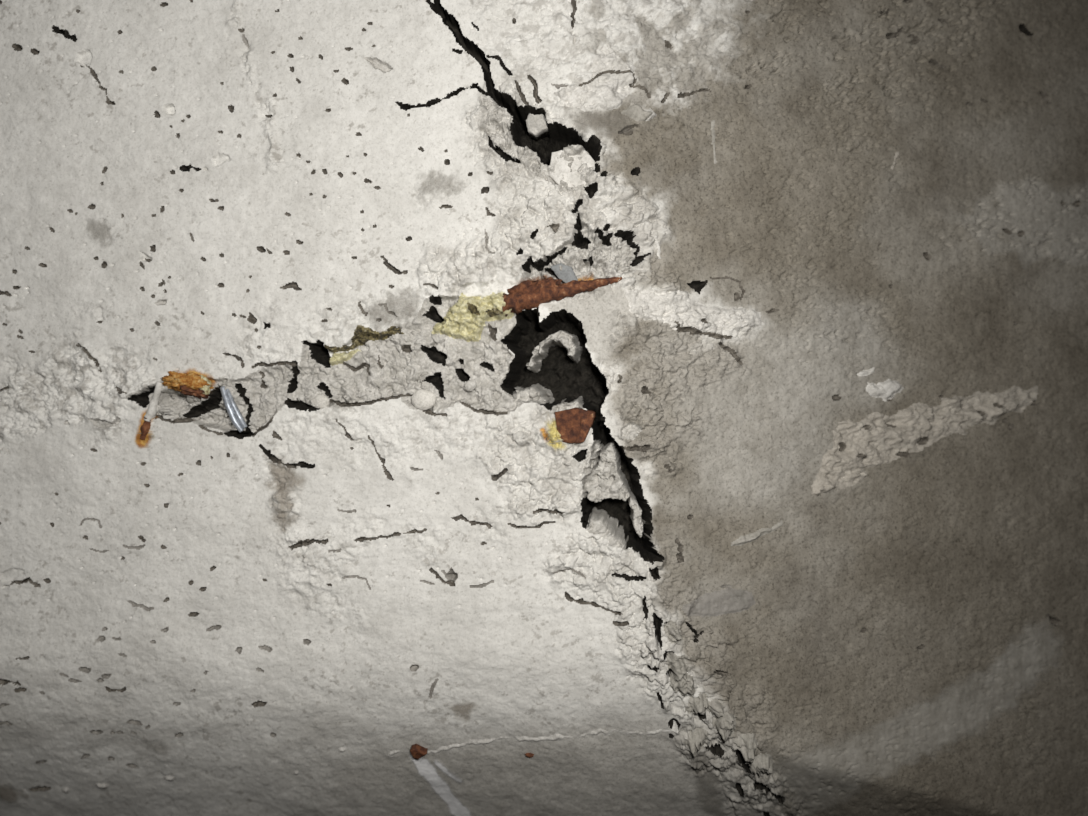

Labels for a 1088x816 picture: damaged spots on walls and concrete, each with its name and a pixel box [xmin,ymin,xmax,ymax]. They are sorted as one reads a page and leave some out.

crack [569,0,577,29]
crack [395,0,523,126]
crack [600,167,641,177]
crack [485,207,496,254]
crack [380,255,438,290]
corrosion [502,276,622,317]
corrosion [180,370,215,399]
corrosion [135,413,157,447]
spalling [126,294,684,565]
corrosion [541,407,597,448]
crack [491,468,508,481]